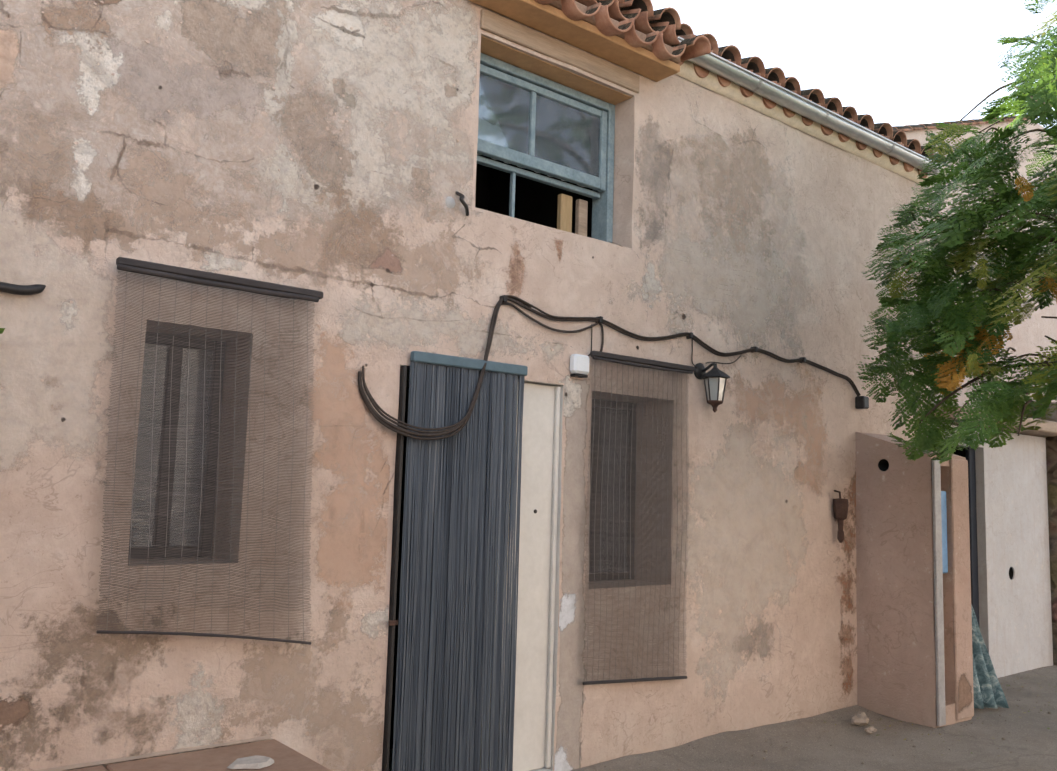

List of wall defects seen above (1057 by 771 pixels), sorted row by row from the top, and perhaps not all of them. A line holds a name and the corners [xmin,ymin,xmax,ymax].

crack [115,134,157,192]
flaking render [42,0,478,274]
flaking render [0,176,113,471]
leakage [837,472,857,694]